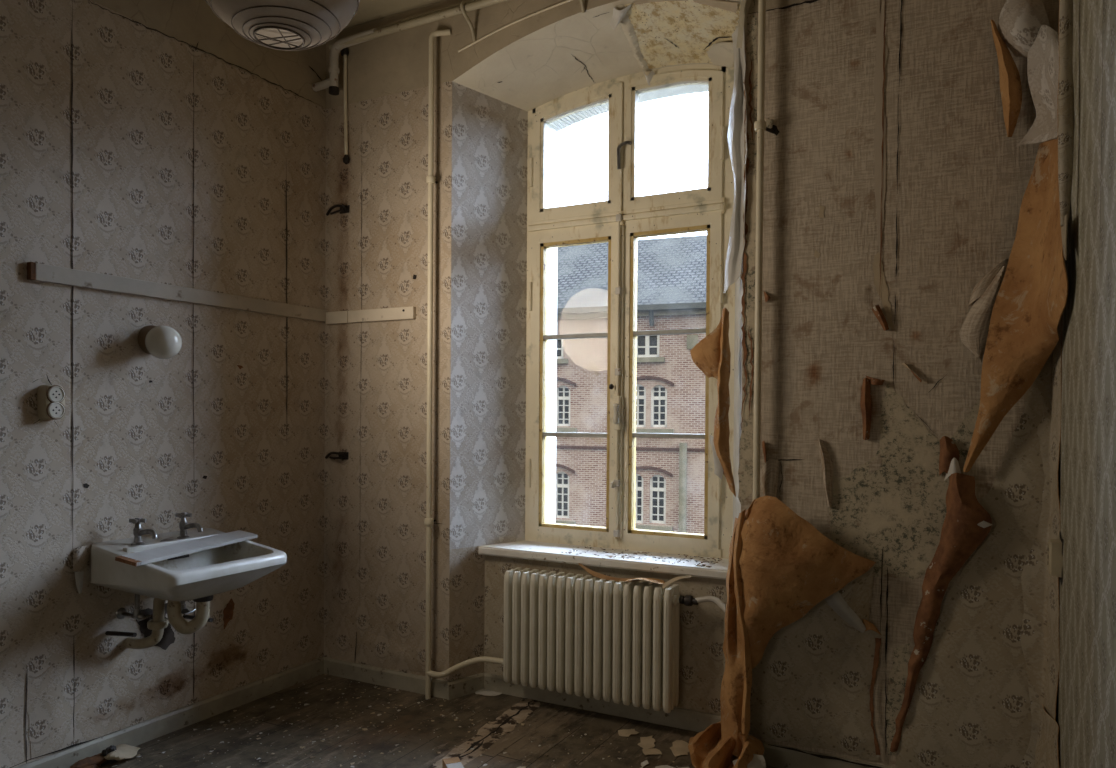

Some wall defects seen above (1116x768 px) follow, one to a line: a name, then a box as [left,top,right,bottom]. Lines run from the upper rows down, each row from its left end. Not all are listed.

flaking render [610,0,779,504]
damp [827,382,980,580]